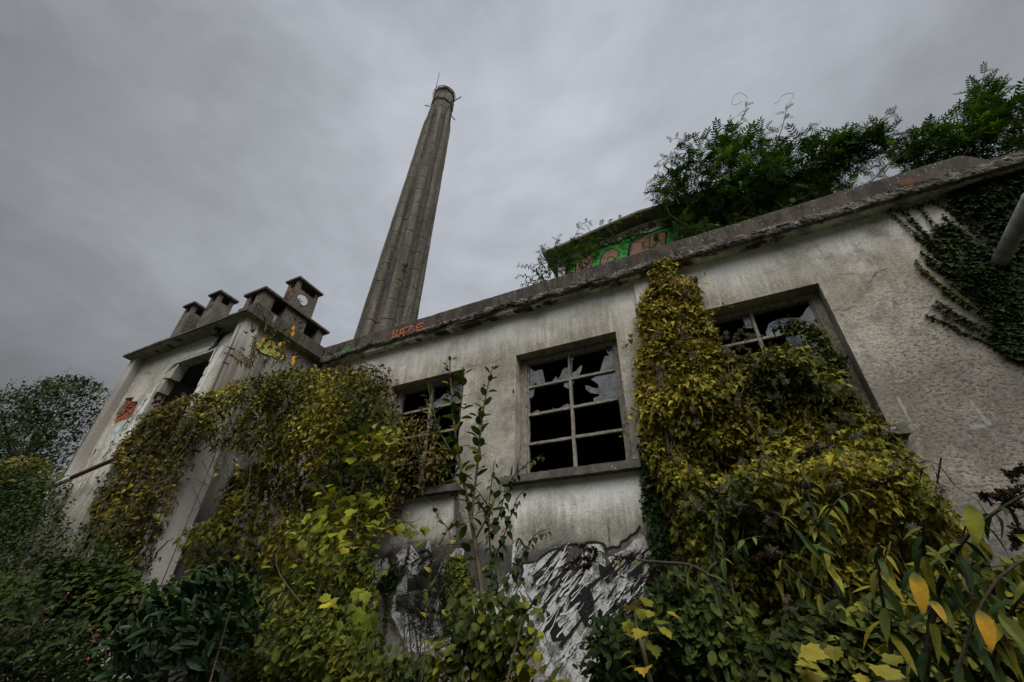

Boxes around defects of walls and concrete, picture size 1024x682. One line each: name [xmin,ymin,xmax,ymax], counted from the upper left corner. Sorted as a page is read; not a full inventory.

spalling [92,338,224,455]